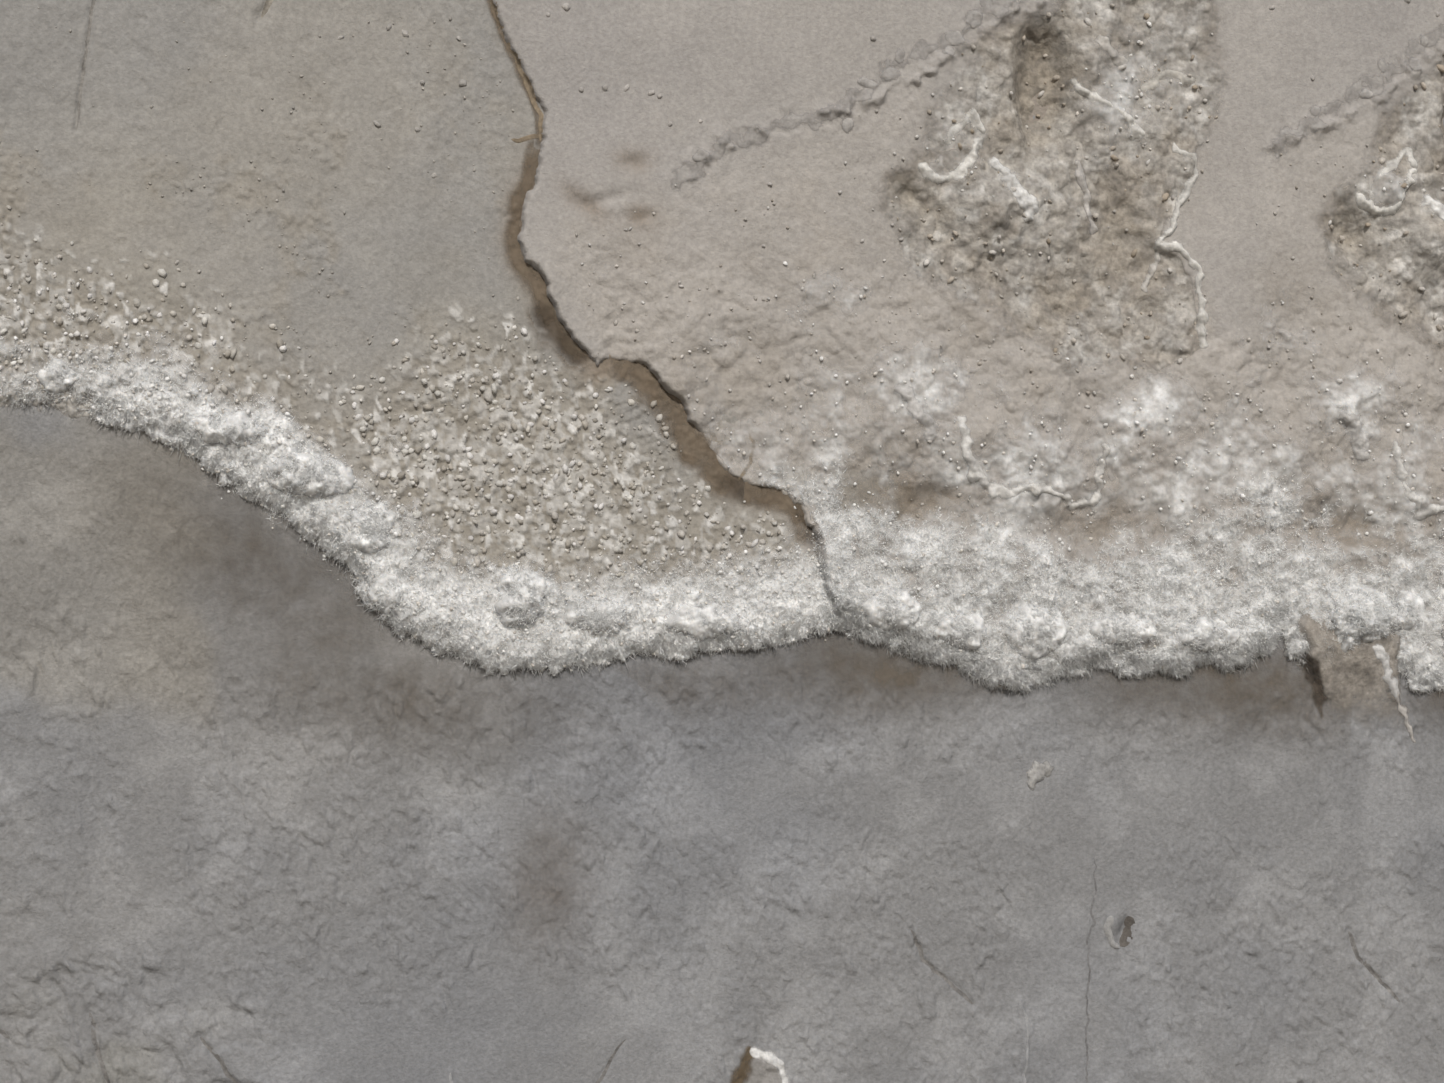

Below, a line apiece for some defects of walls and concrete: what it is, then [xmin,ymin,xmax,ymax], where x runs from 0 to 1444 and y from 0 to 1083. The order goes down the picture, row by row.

crack [487,0,818,574]
peeling [0,0,1444,742]
damp [0,288,1444,710]
damp [1085,22,1165,136]
flaking render [731,1047,788,1083]